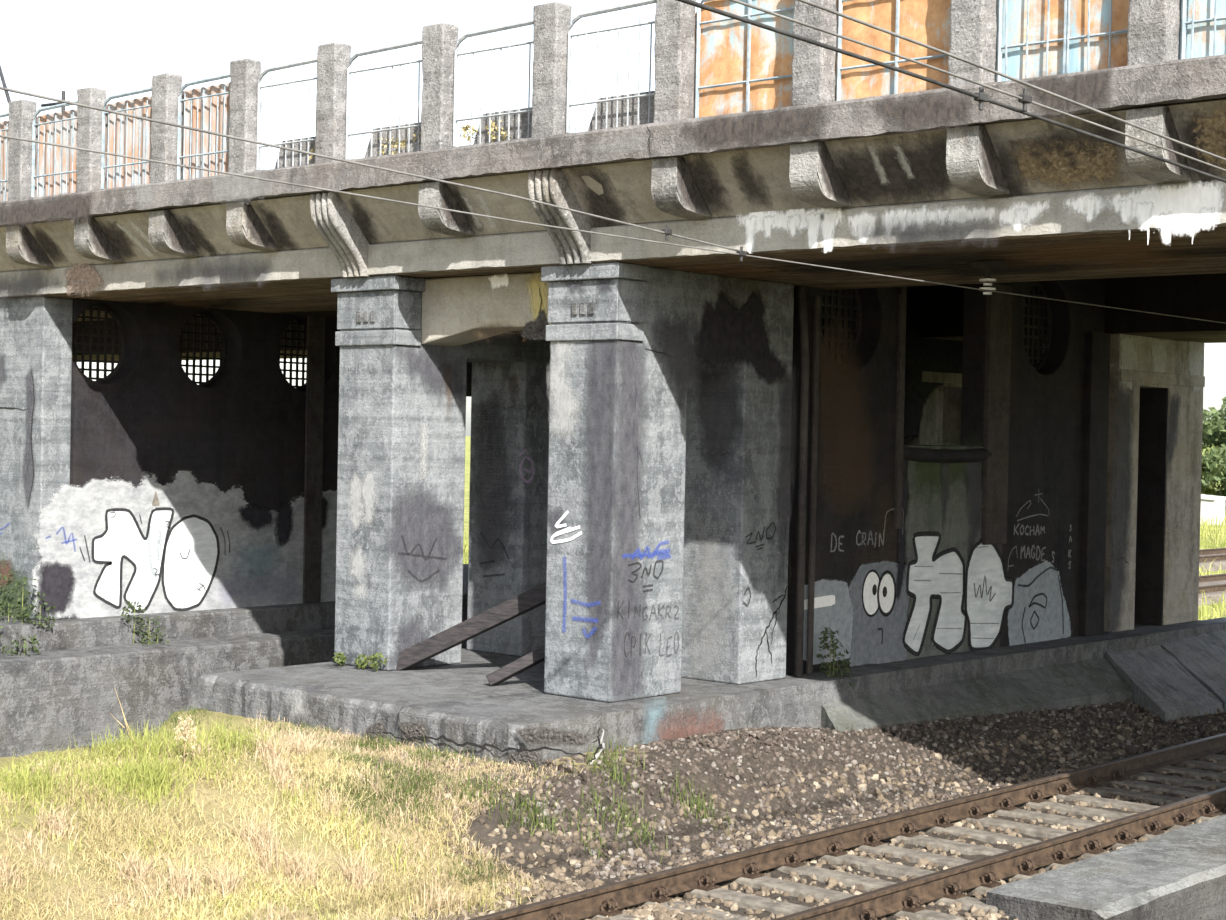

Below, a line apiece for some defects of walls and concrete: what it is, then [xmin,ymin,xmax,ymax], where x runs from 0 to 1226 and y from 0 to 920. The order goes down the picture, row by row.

leakage [678,69,1119,279]
leakage [1066,107,1226,257]
spalling [65,263,104,295]
leakage [657,322,743,466]
crack [382,728,605,764]